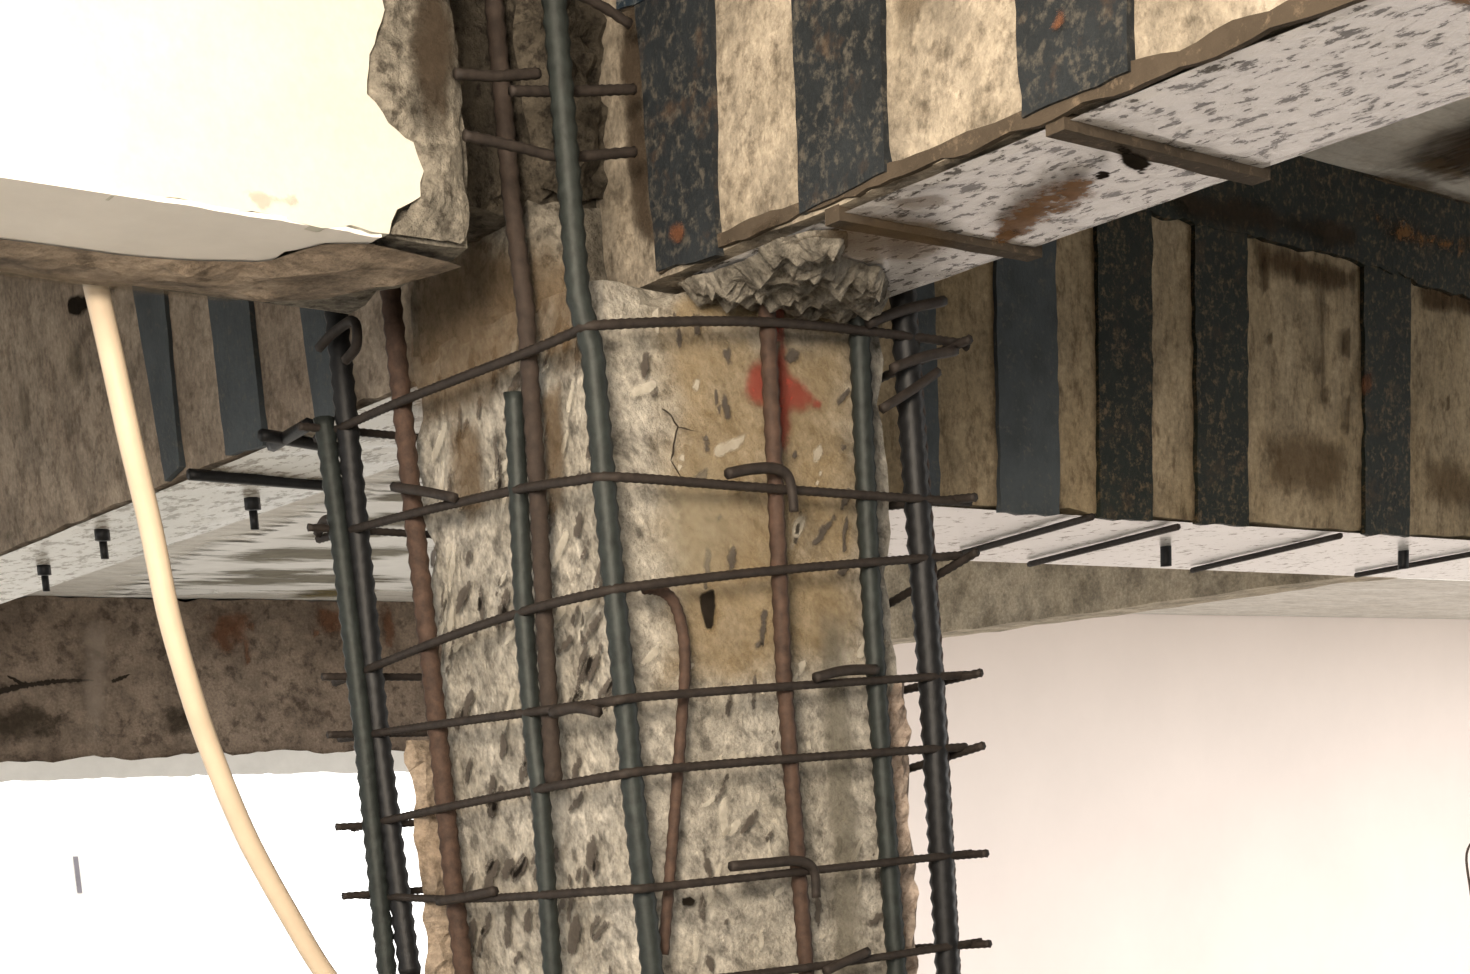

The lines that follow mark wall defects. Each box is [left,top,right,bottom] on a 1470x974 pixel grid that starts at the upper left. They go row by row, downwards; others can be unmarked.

spalling [513,0,558,193]
spalling [566,0,608,201]
corrosion [992,179,1097,244]
spalling [676,230,891,324]
crack [0,674,130,695]
peeling [0,752,208,783]
peeling [224,750,358,775]
spalling [391,740,455,974]
spalling [888,683,919,974]